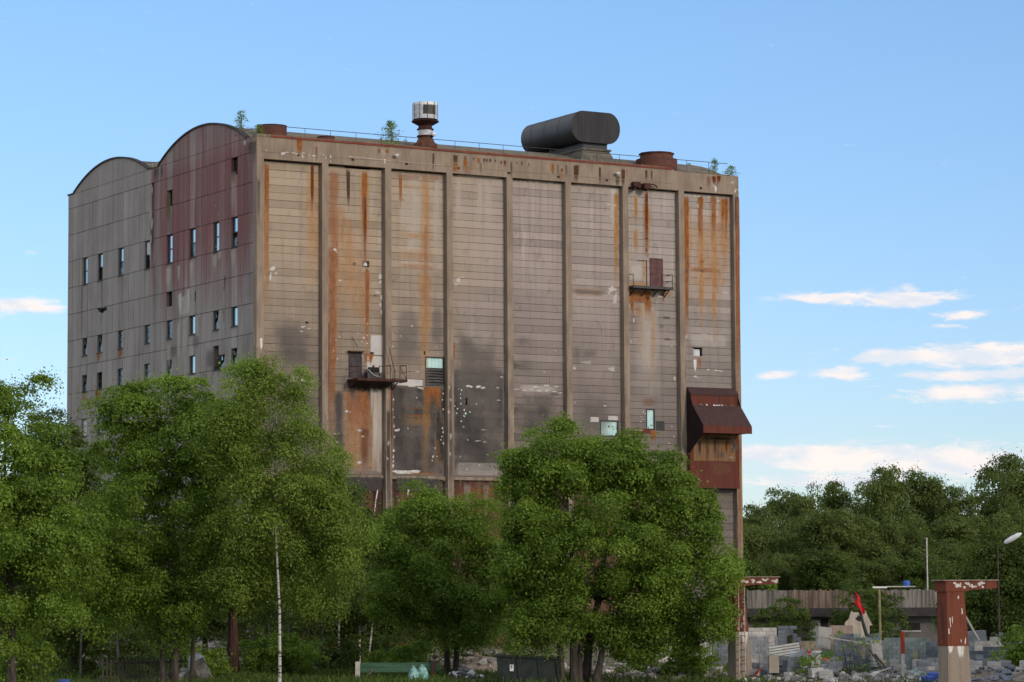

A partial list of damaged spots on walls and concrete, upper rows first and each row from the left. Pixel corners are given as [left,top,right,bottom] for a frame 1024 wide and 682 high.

damp [166,262,193,352]
corrosion [328,172,371,465]
corrosion [629,290,665,314]
corrosion [684,175,740,368]
corrosion [412,387,441,409]
corrosion [699,437,741,545]
peeling [948,581,985,634]